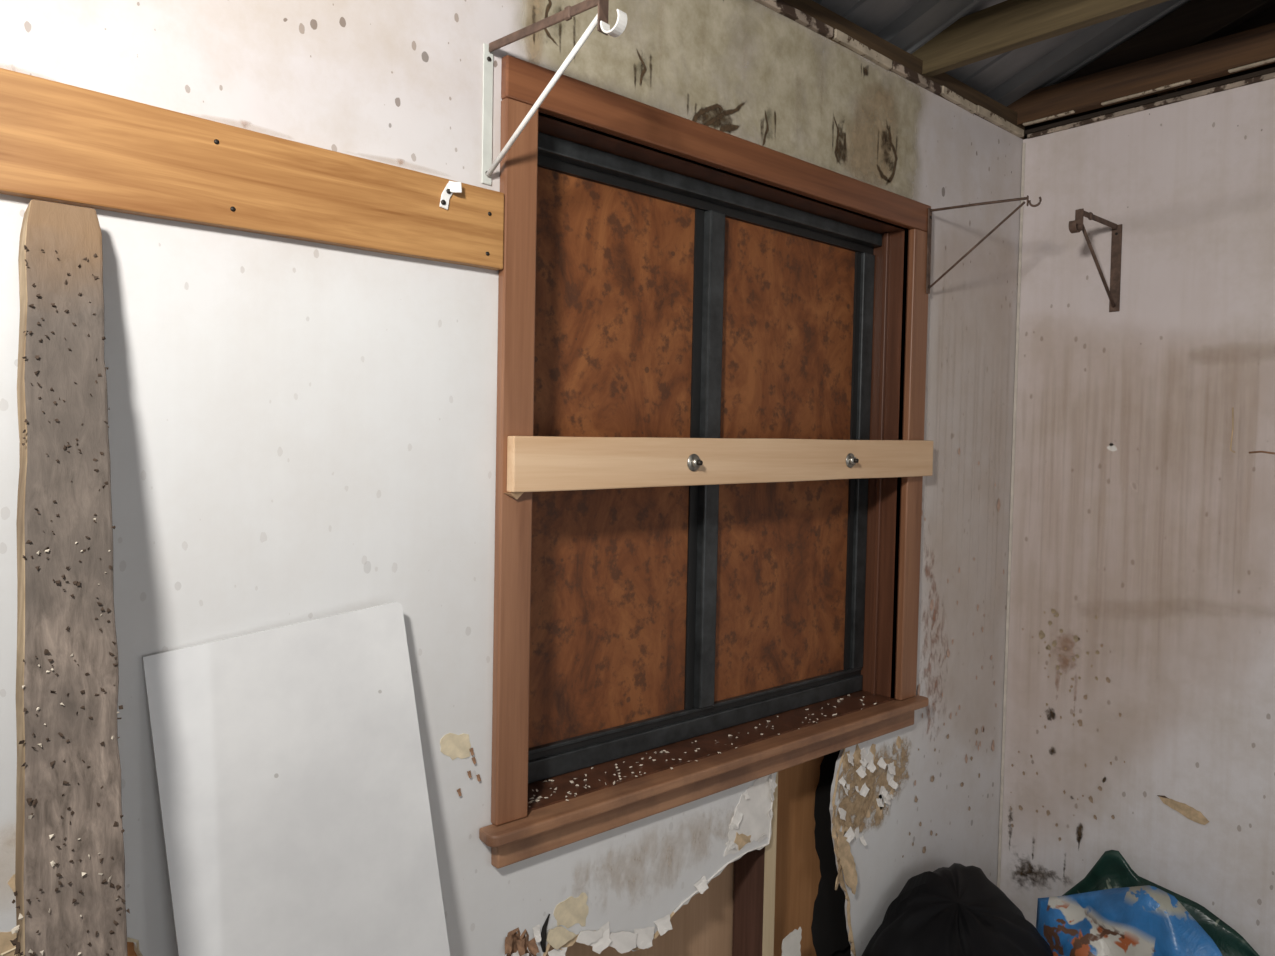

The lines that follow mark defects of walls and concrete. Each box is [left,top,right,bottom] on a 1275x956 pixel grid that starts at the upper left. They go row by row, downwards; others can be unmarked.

leakage [523,0,921,199]
spalling [0,931,16,956]
spalling [505,774,777,956]
spalling [781,927,802,956]
peeling [832,736,919,956]